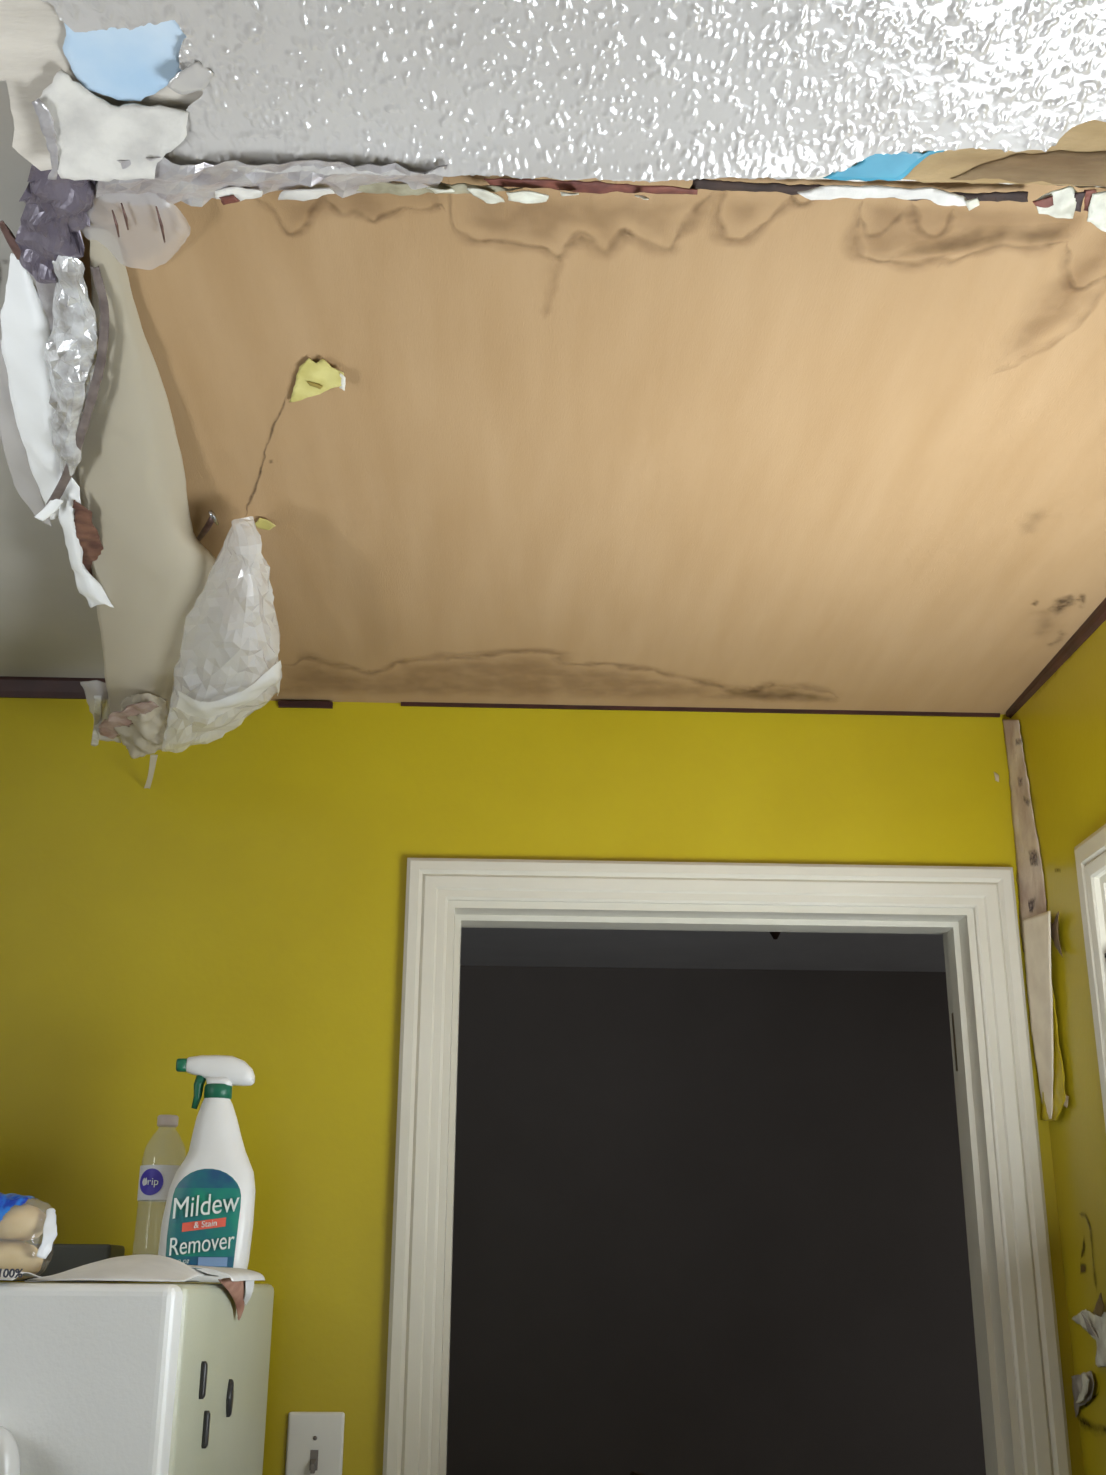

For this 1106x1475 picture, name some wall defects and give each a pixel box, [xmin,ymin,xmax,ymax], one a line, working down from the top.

peeling [215,186,335,201]
peeling [823,120,1106,211]
peeling [1051,911,1063,957]
peeling [1071,1293,1106,1417]